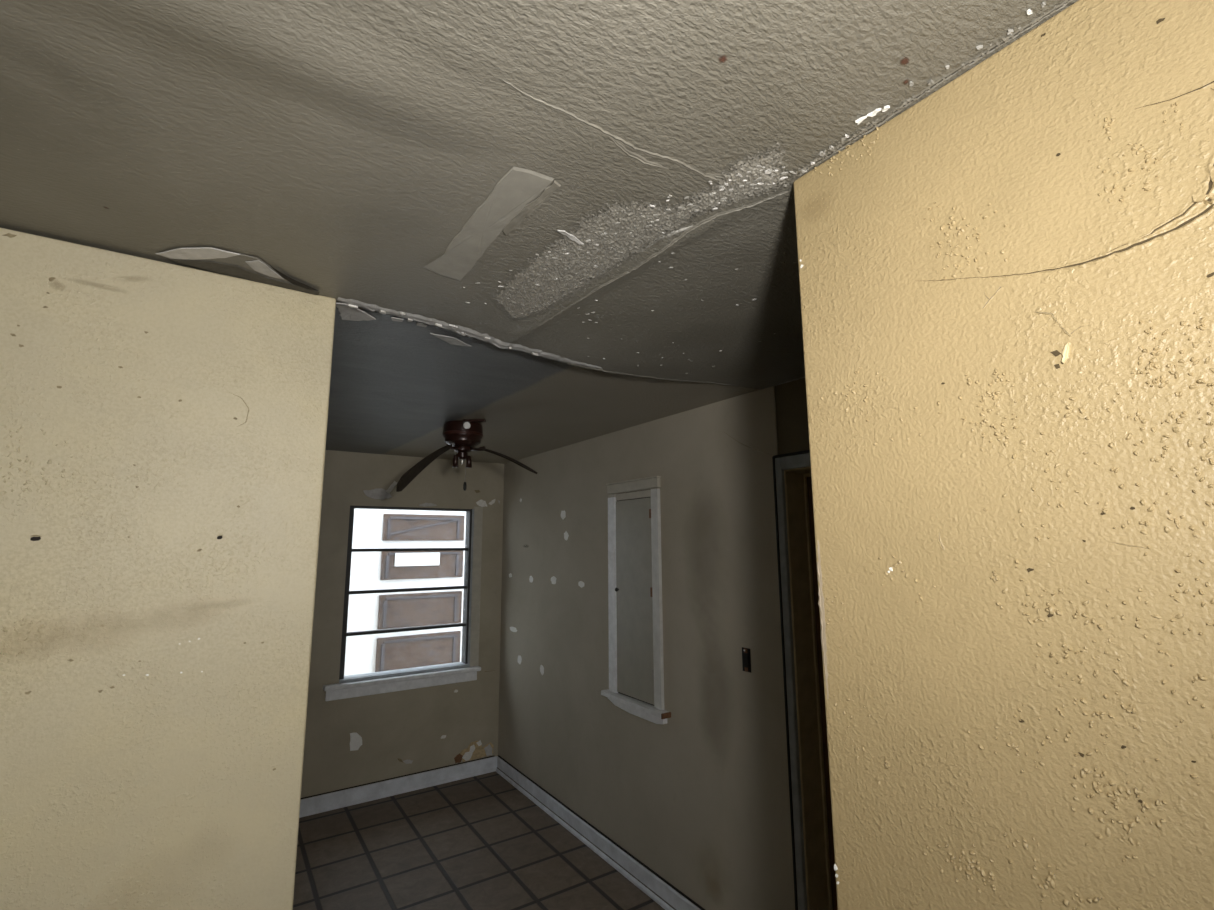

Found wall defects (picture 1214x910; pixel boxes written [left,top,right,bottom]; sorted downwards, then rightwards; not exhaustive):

spalling [485,0,1073,321]
crack [1134,80,1214,110]
peeling [423,167,560,304]
crack [928,151,1214,309]
spalling [336,297,759,389]
crack [1035,311,1090,337]